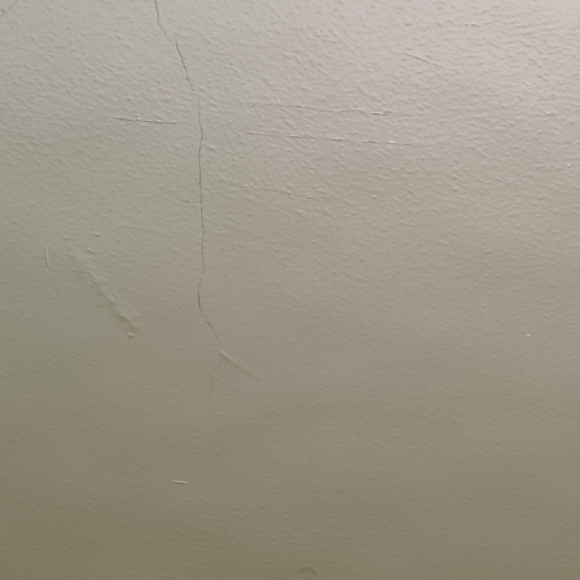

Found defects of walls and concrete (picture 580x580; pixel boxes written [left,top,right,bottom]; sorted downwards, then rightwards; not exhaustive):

crack [155,0,218,341]